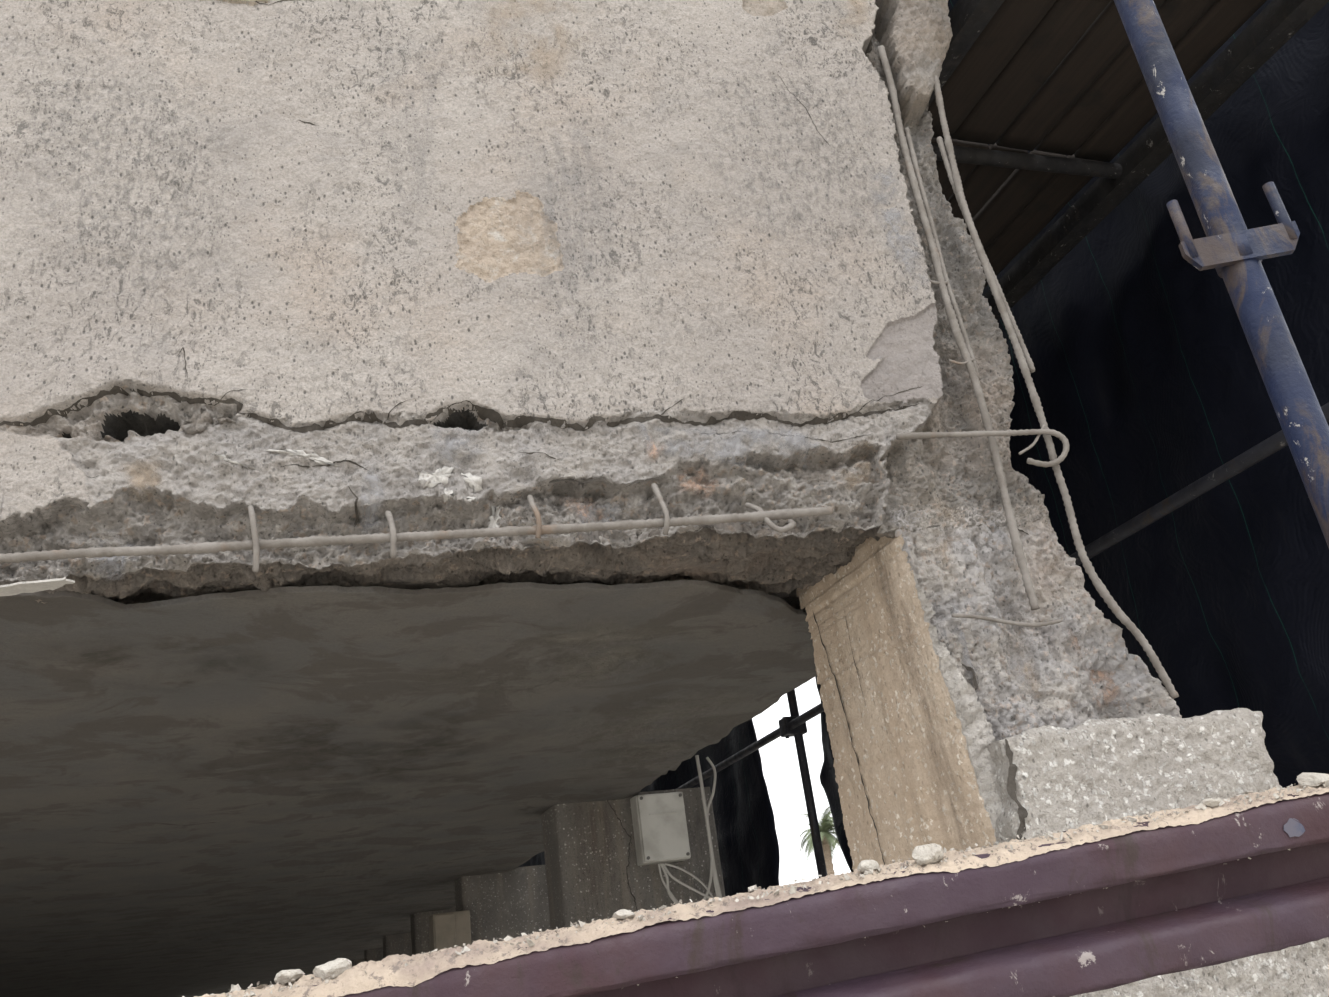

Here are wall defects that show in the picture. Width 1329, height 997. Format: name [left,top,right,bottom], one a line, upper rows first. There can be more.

crack [0,347,922,433]
flaking render [0,0,1182,838]